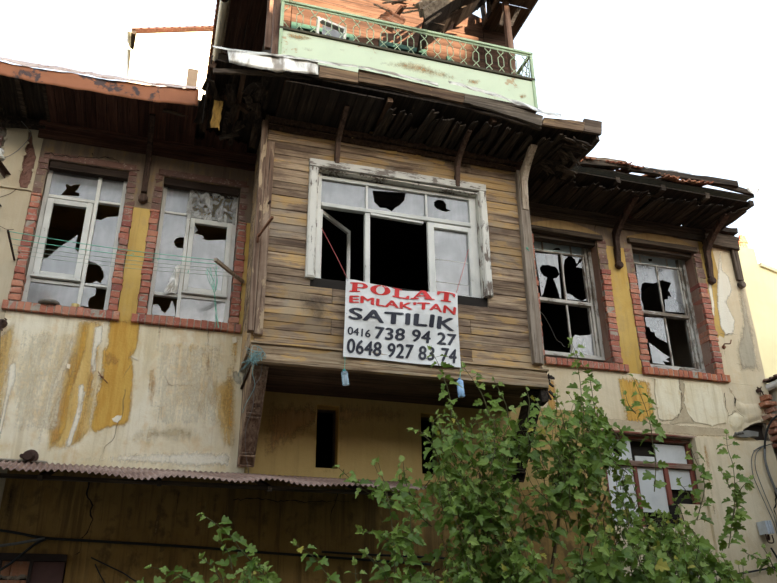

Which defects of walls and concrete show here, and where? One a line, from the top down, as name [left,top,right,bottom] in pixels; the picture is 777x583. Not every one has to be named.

damp [0,322,102,448]
damp [149,347,240,444]